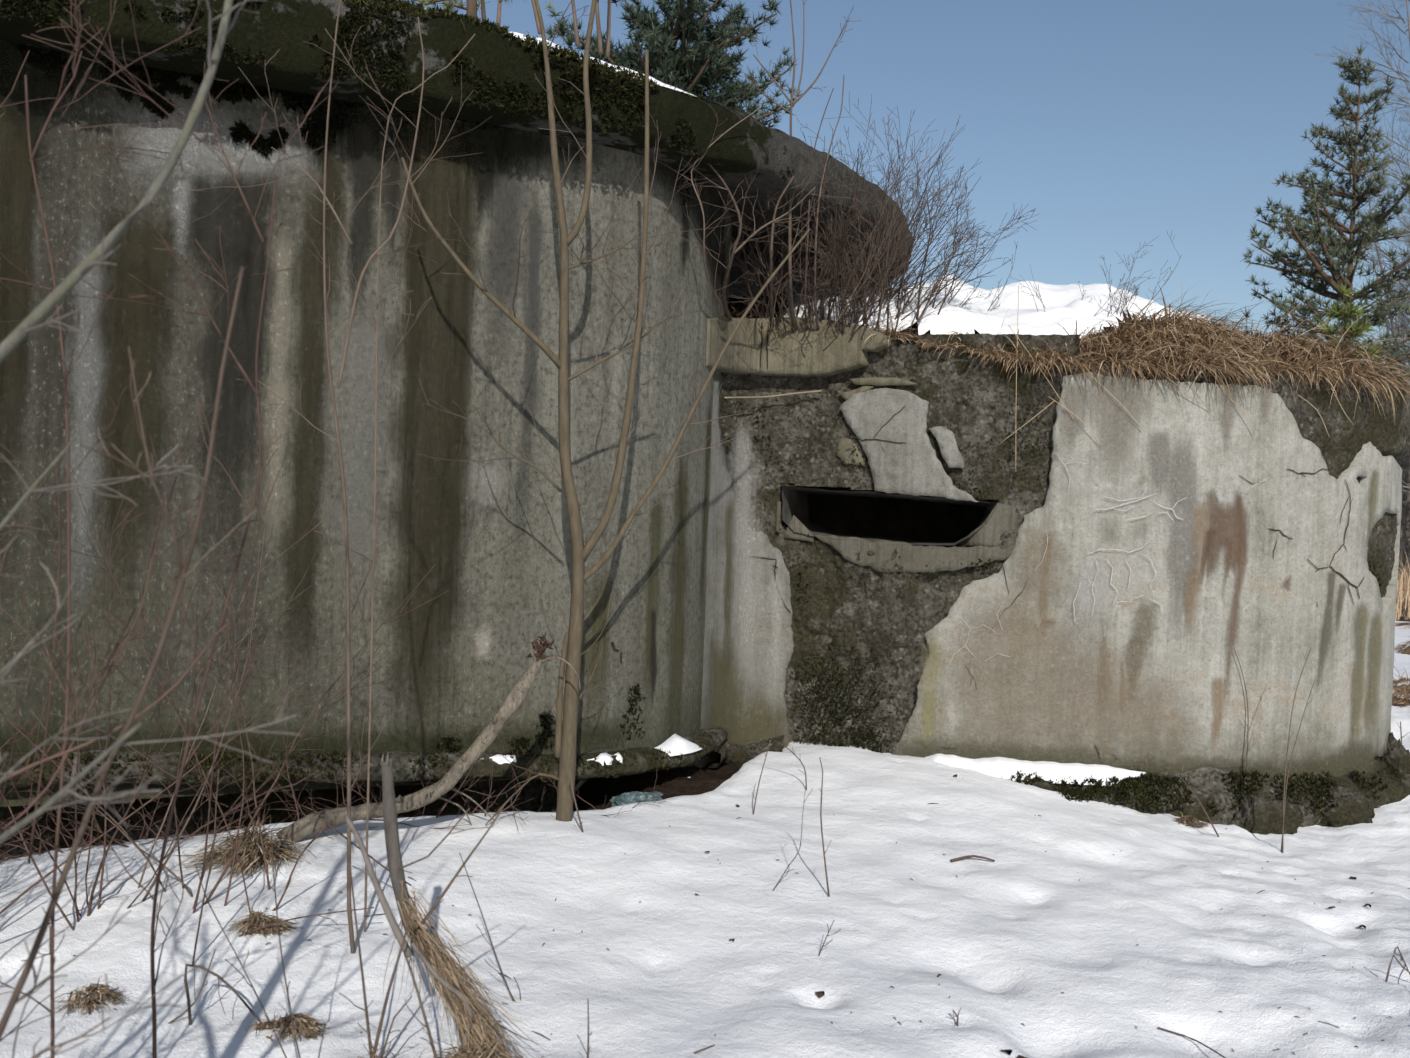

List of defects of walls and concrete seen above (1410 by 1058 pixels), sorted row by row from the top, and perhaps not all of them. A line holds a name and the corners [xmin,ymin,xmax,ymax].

damp [649,158,726,293]
damp [71,93,586,716]
damp [0,729,555,753]
damp [646,468,687,719]
damp [708,430,782,757]
spalling [706,317,1080,753]
crack [990,564,1029,632]
damp [904,607,1382,781]
spalling [1022,732,1410,835]
rust [1186,494,1247,739]
crack [1239,468,1364,607]
spalling [1367,512,1399,598]